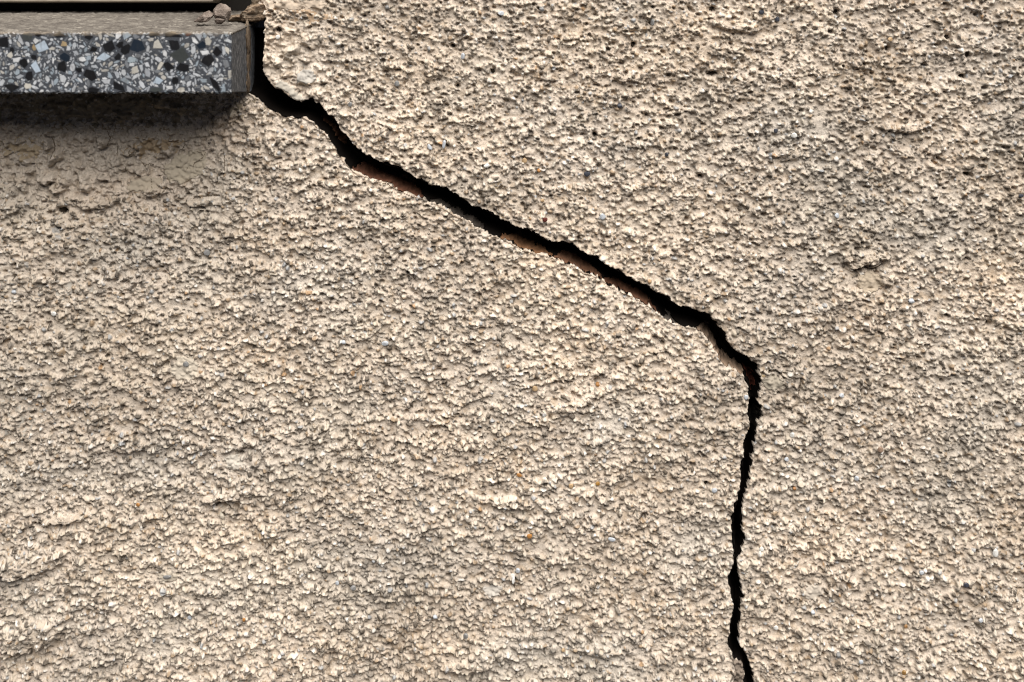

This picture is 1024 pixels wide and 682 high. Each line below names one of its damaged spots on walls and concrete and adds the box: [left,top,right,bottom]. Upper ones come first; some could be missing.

crack [250,19,762,682]